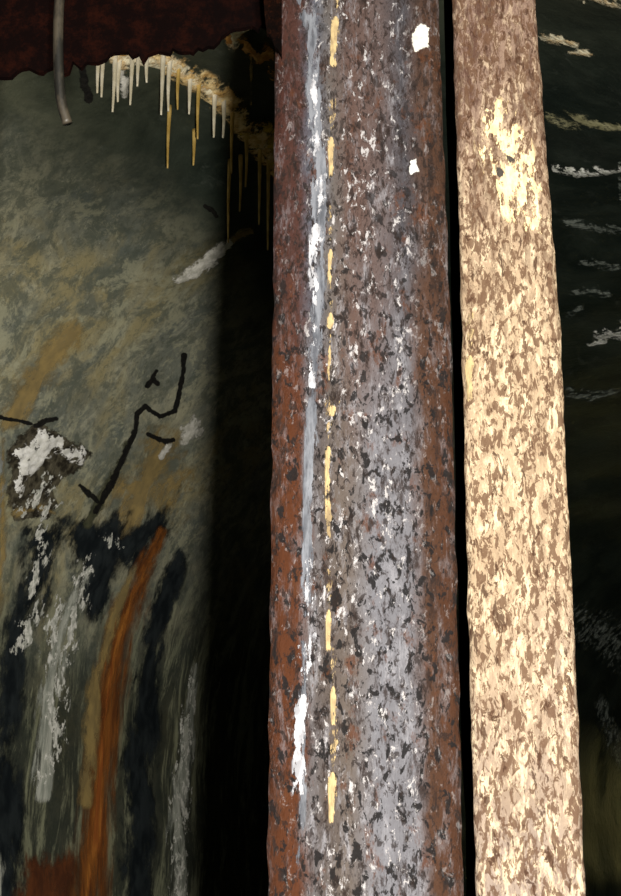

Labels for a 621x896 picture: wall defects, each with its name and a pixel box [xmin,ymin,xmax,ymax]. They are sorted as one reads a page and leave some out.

peeling [412,24,429,52]
leakage [538,34,592,57]
leakage [96,54,274,284]
peeling [409,159,419,175]
leakage [552,162,621,200]
peeling [296,0,341,619]
crack [0,415,58,428]
spalling [6,425,93,522]
crack [78,353,187,528]
corrosion [17,527,166,896]
leakage [0,415,204,896]
peeling [291,610,338,866]